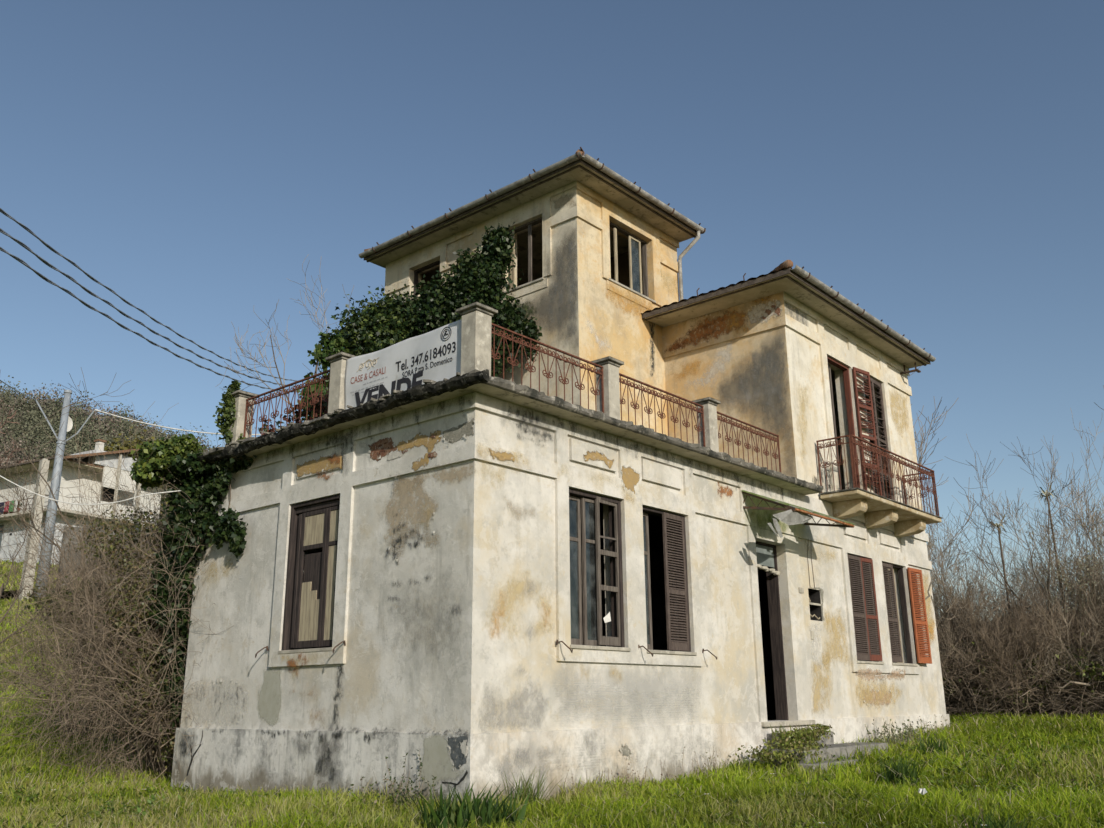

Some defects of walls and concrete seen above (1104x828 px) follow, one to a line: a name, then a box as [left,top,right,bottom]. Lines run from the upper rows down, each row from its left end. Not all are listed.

water stain [518,233,577,337]
flaking render [669,297,783,351]
water stain [720,336,803,441]
flaking render [295,453,343,480]
flaking render [359,419,475,564]
peeling [489,448,515,461]
flaking render [583,449,640,494]
water stain [297,666,378,779]
flaking render [447,733,468,771]